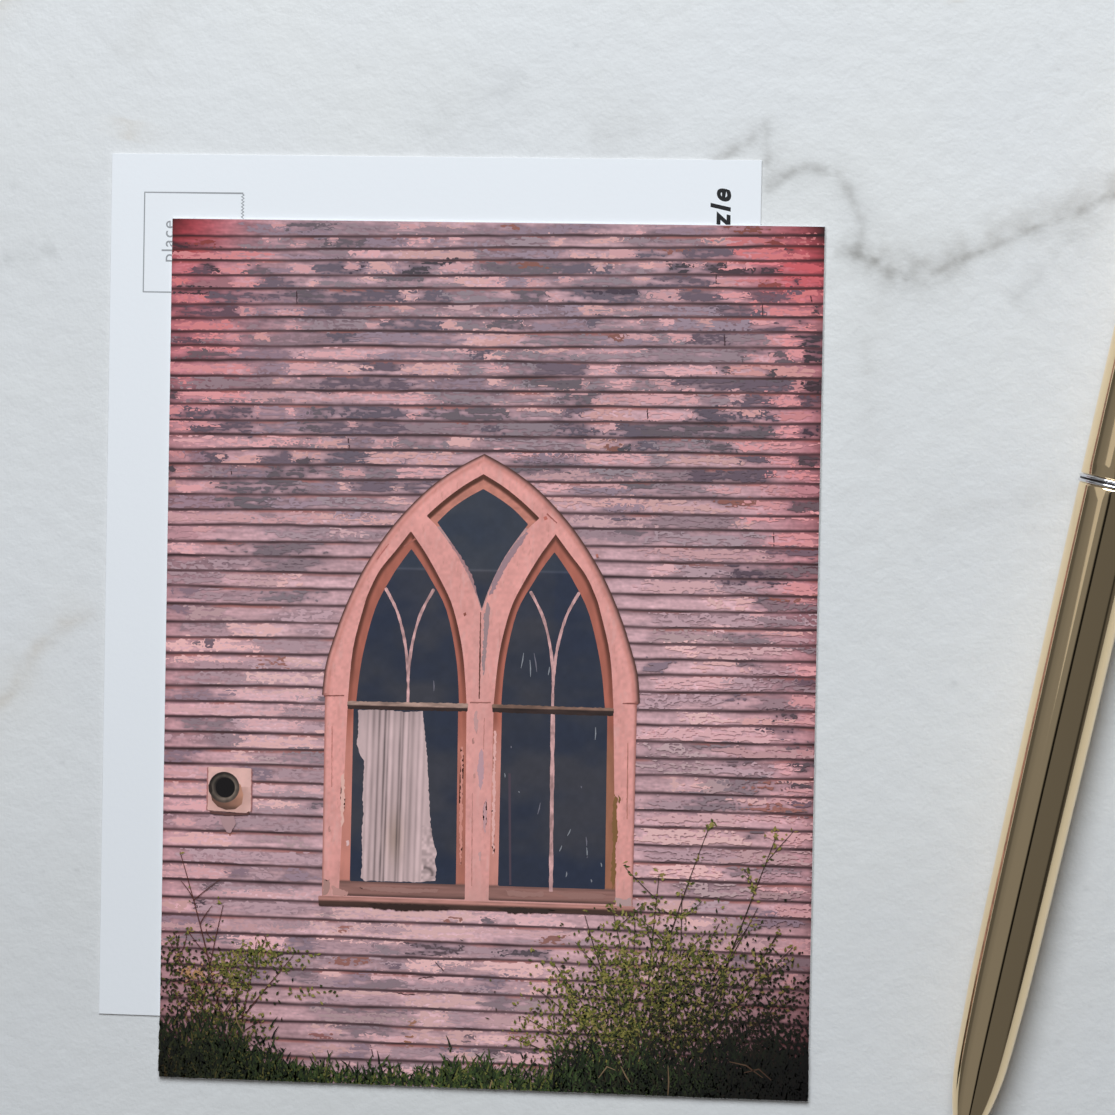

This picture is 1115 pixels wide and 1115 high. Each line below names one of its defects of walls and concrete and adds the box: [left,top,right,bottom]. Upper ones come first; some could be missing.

peeling [163,220,825,865]